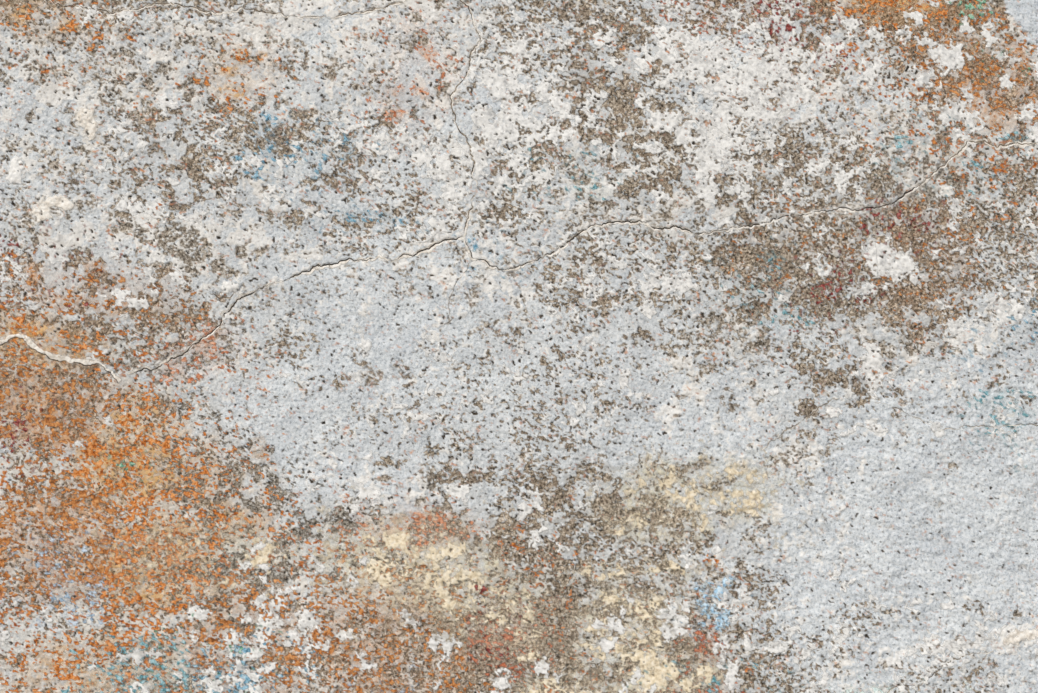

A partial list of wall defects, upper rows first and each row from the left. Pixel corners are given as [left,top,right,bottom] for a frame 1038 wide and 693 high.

crack [0,0,1038,383]
corrosion [653,0,1038,142]
corrosion [0,248,554,693]
crack [868,394,1038,430]